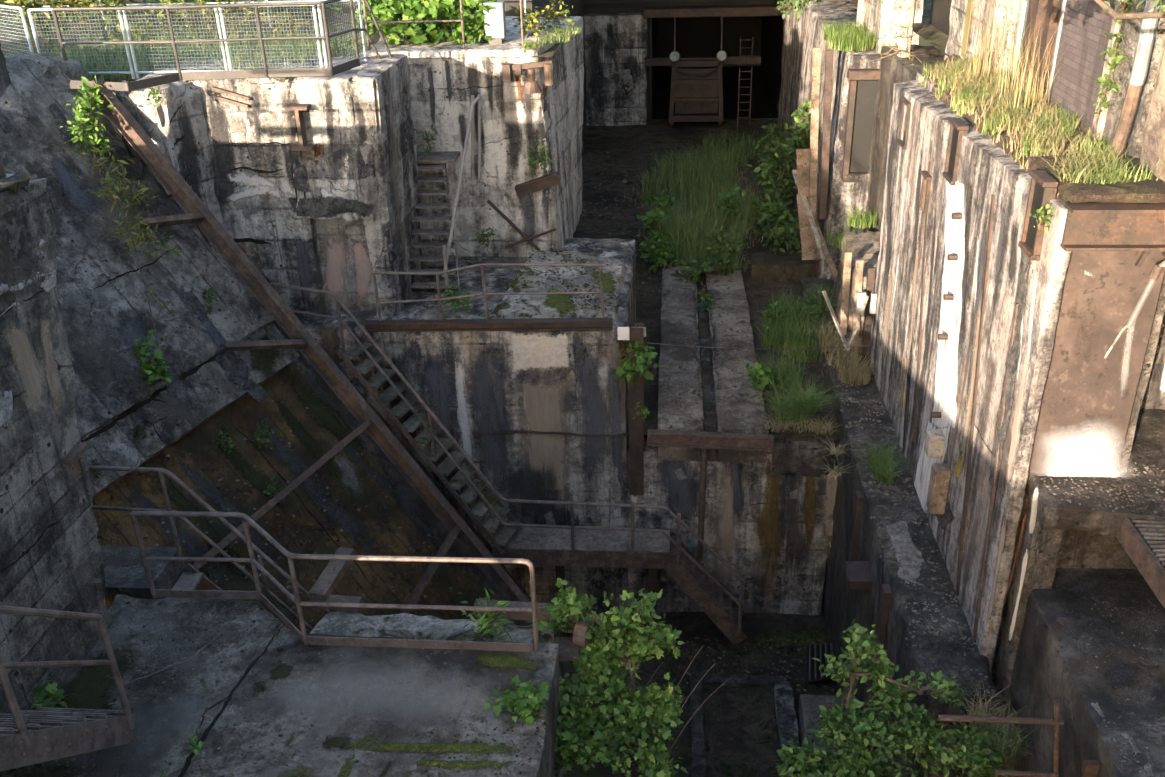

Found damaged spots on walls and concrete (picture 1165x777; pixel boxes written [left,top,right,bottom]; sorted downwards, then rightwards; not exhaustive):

water stain [428,60,452,121]
water stain [457,58,555,248]
water stain [883,130,922,316]
water stain [0,268,57,316]
water stain [0,320,63,429]
water stain [902,212,936,455]
water stain [961,180,1039,622]
water stain [657,461,699,523]
water stain [714,462,744,560]
water stain [755,449,858,581]
crack [178,624,285,777]